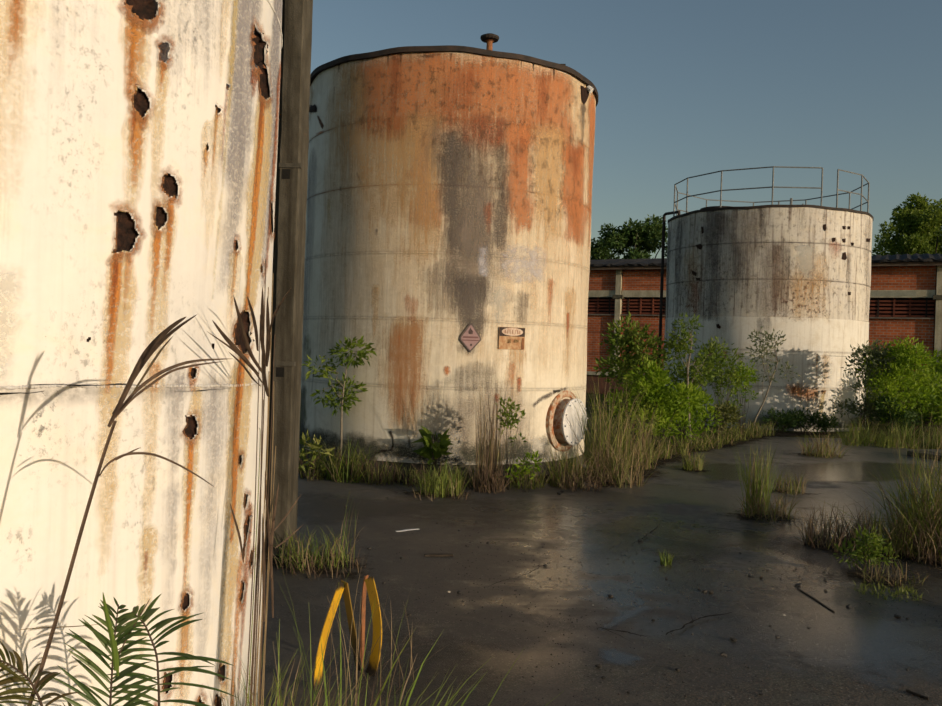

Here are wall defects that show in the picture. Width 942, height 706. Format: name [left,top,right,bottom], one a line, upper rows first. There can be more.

rust [102,172,181,450]
rust [121,0,174,194]
rust [184,367,201,540]
rust [204,0,238,166]
rust [197,323,254,705]
rust [232,22,281,329]
rust [389,304,422,422]
water stain [429,135,505,334]
rust [463,81,595,263]